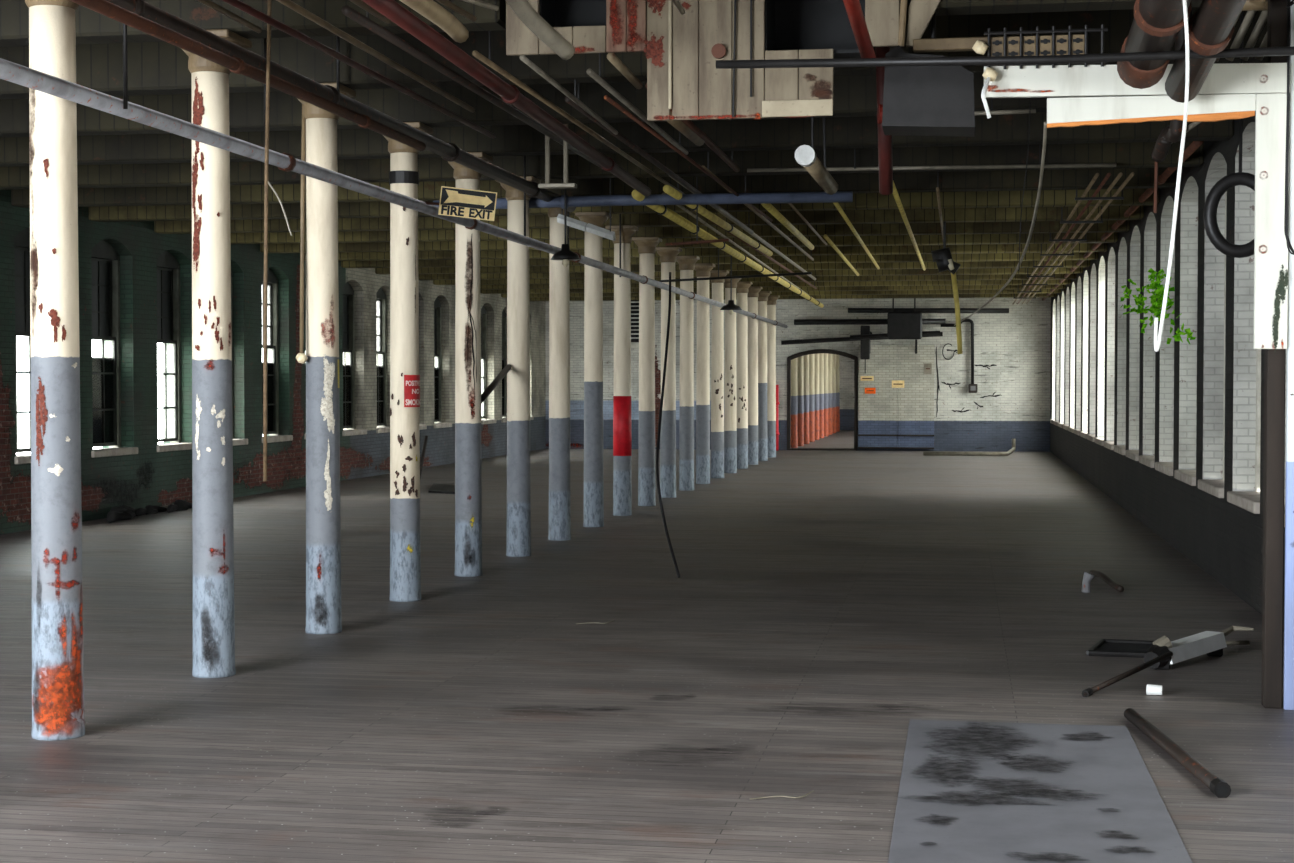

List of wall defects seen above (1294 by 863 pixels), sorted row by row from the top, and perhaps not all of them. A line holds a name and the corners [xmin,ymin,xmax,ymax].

peeling [0,352,64,525]
peeling [81,477,107,512]
peeling [195,264,306,490]
peeling [320,354,432,511]
corrosion [33,548,84,734]